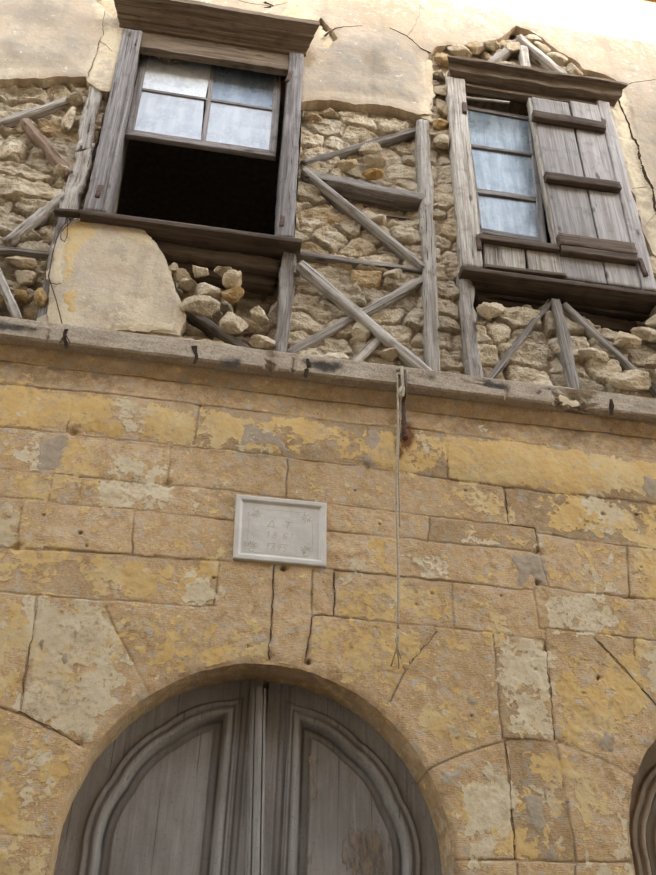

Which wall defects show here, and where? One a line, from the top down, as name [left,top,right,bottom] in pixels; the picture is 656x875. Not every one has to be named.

crack [87,11,110,78]
flaking render [96,0,117,16]
crack [239,0,288,8]
peeling [282,0,334,48]
crack [322,26,354,37]
crack [391,7,432,54]
crack [618,79,656,226]
flaking render [0,83,96,322]
flaking render [287,34,584,374]
flaking render [121,262,280,351]
flaking render [473,302,656,408]
peeling [0,373,656,875]